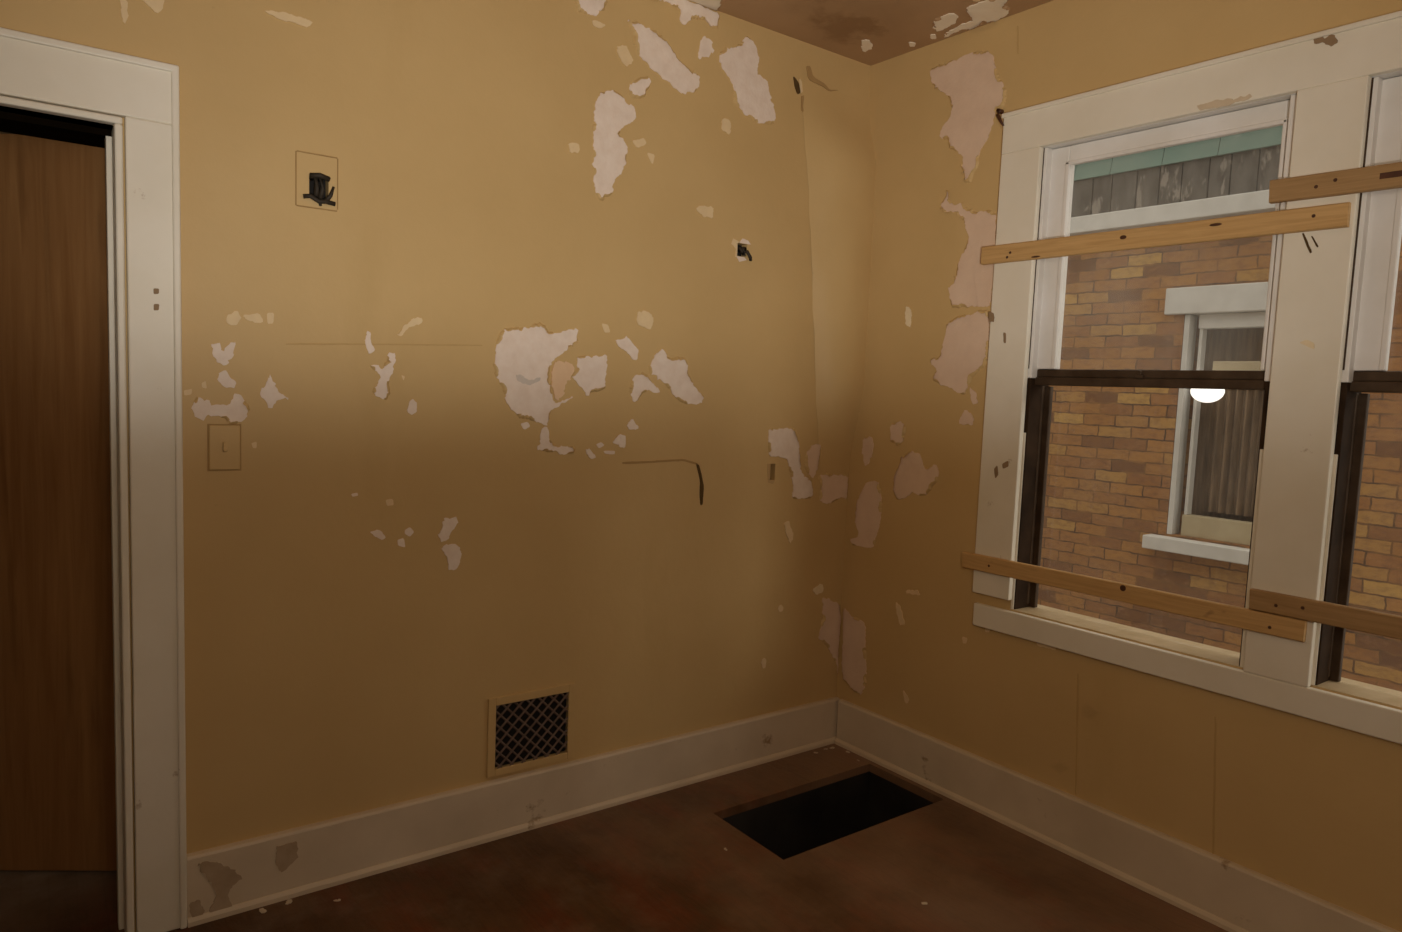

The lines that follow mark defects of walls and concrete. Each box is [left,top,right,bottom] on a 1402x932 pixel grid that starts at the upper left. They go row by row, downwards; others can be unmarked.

flaking render [909,0,1010,47]
peeling [568,0,776,201]
peeling [930,51,1007,183]
peeling [184,342,288,425]
peeling [226,311,274,325]
peeling [365,331,405,400]
peeling [493,310,704,459]
peeling [930,190,1006,425]
peeling [768,421,939,548]
peeling [812,584,868,695]
peeling [189,861,242,918]